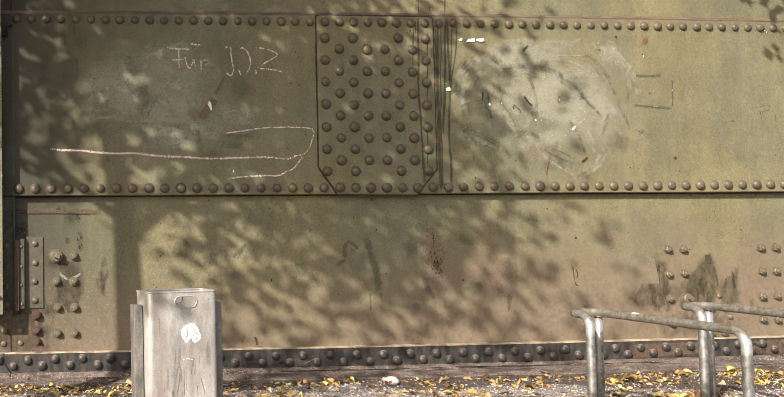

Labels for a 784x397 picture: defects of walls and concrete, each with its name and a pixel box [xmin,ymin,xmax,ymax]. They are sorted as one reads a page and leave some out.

water stain [409,4,457,187]
water stain [687,254,716,302]